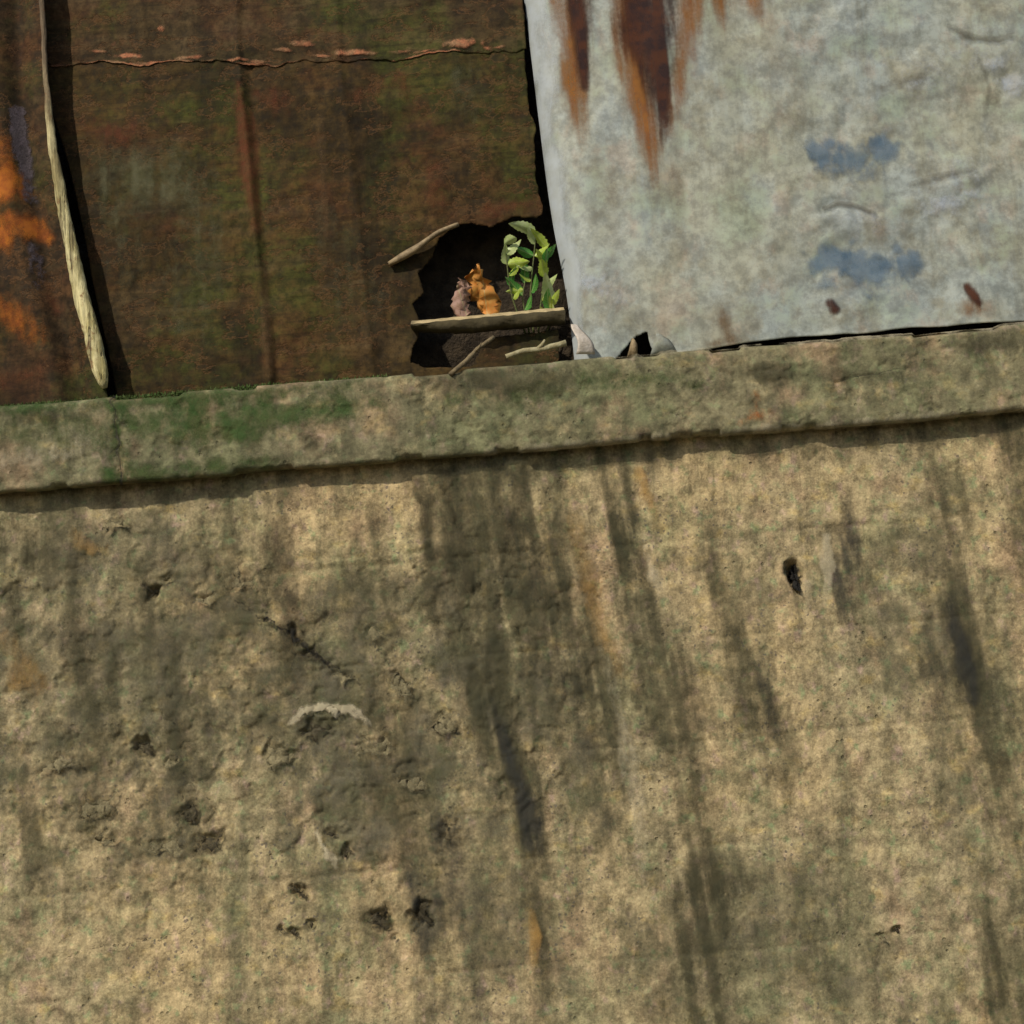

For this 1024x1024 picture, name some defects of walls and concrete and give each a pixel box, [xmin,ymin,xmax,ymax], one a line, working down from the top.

rust [551,0,588,124]
rust [613,0,723,167]
rust [0,146,27,201]
rust [0,213,52,246]
rust [826,299,840,313]
rust [964,283,981,306]
crack [240,602,359,681]
water stain [453,470,554,966]
water stain [943,576,1008,792]